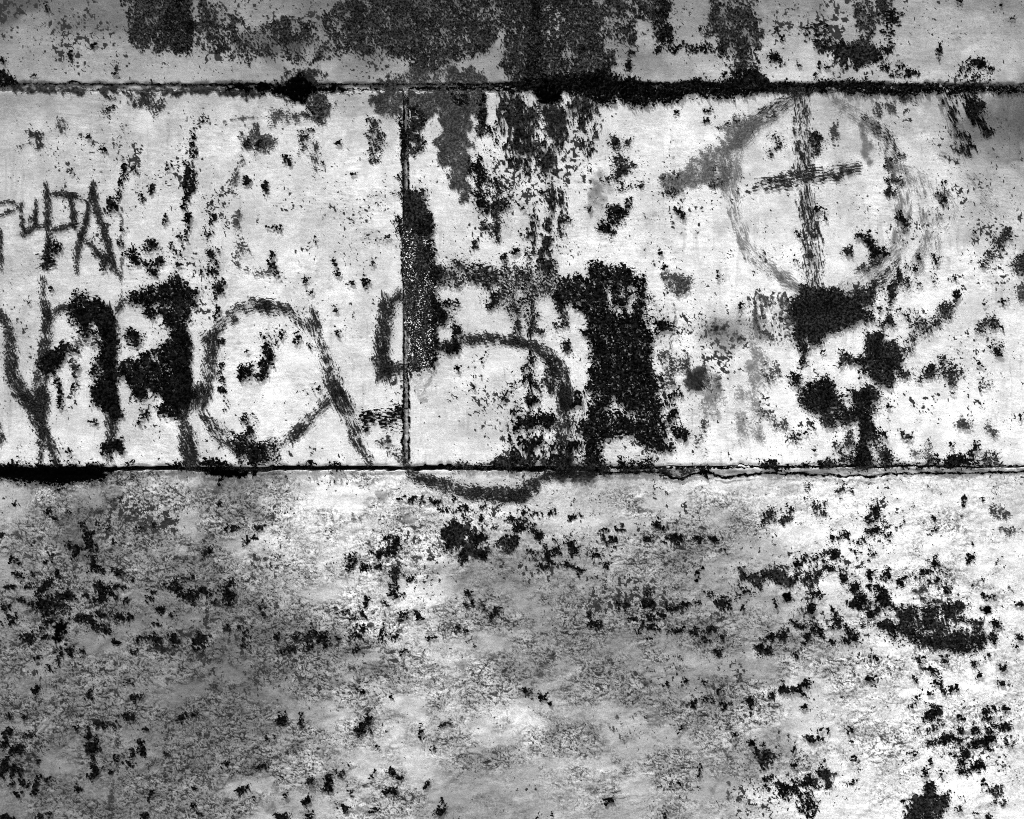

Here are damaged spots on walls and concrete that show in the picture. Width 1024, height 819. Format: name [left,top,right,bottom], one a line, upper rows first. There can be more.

damp [402,85,615,271]
damp [752,83,820,97]